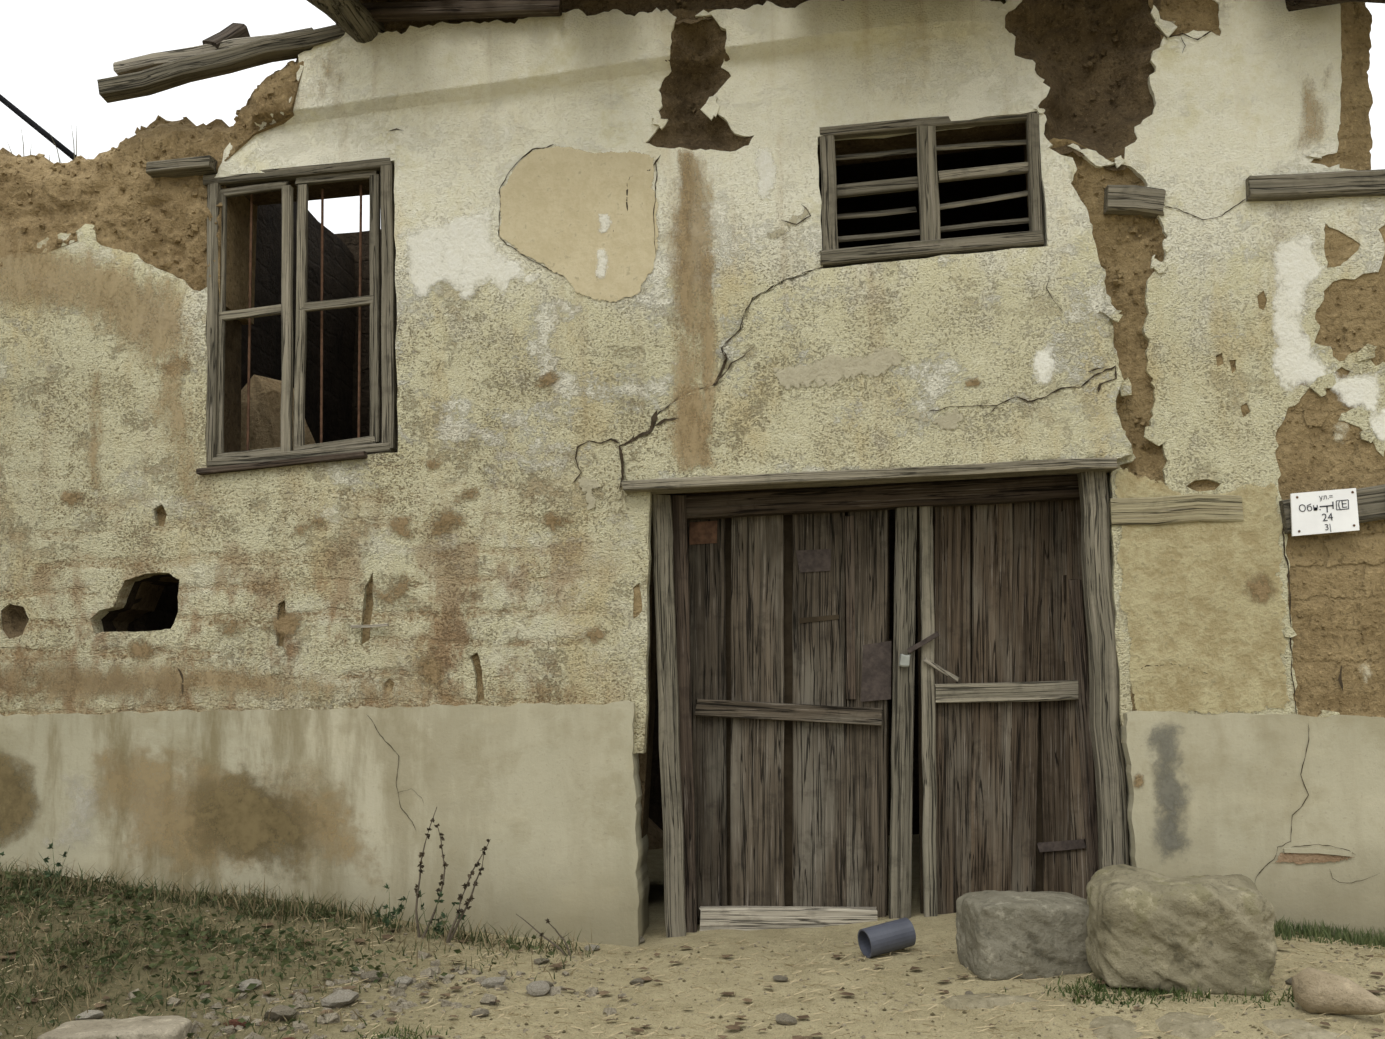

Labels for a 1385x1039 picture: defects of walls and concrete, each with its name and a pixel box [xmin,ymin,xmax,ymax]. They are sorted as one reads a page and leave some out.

spalling [383,17,527,34]
peeling [407,0,809,302]
water stain [677,152,715,469]
crack [574,267,824,489]
peeling [990,0,1385,718]
spalling [101,574,175,659]
spalling [361,573,410,645]
spalling [472,653,484,702]
crack [1255,526,1375,883]
water stain [0,754,38,844]
water stain [102,755,355,871]
water stain [1150,726,1186,854]